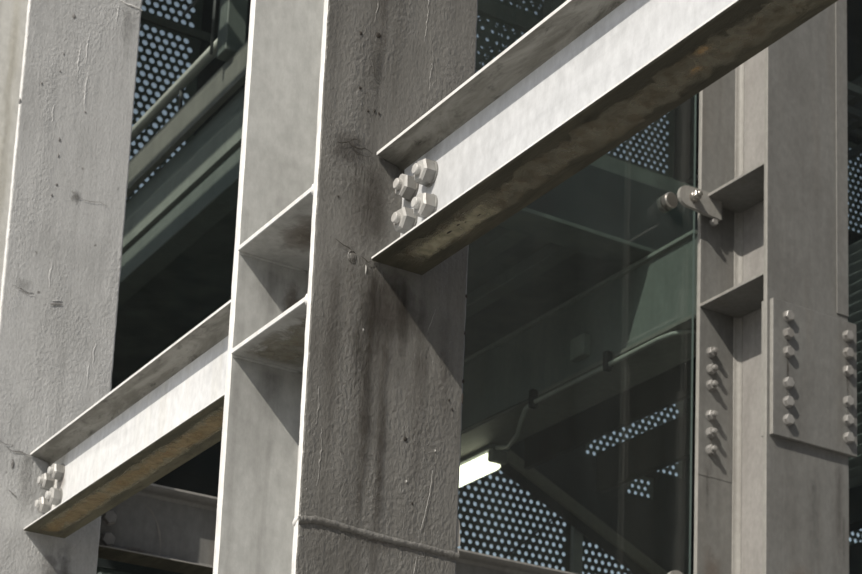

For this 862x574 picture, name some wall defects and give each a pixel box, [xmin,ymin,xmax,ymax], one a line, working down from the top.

corrosion [407,128,605,259]
corrosion [51,409,224,526]